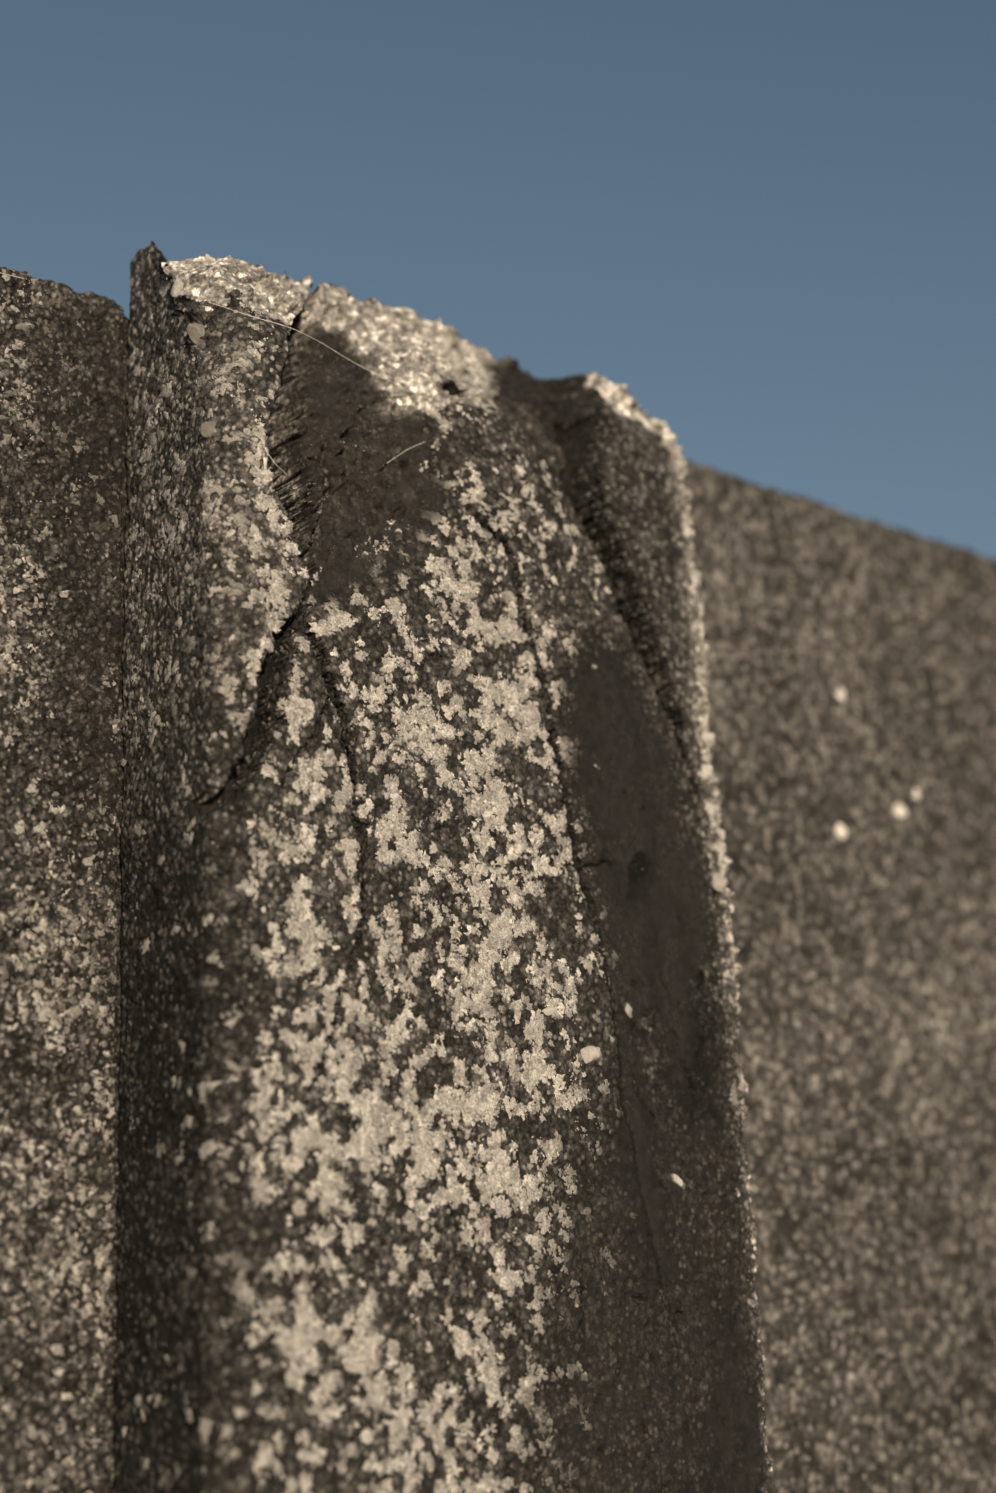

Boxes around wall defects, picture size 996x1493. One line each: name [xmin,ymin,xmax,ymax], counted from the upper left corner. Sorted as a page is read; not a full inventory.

crack [266,297,313,564]
crack [555,419,609,563]
crack [186,611,324,820]